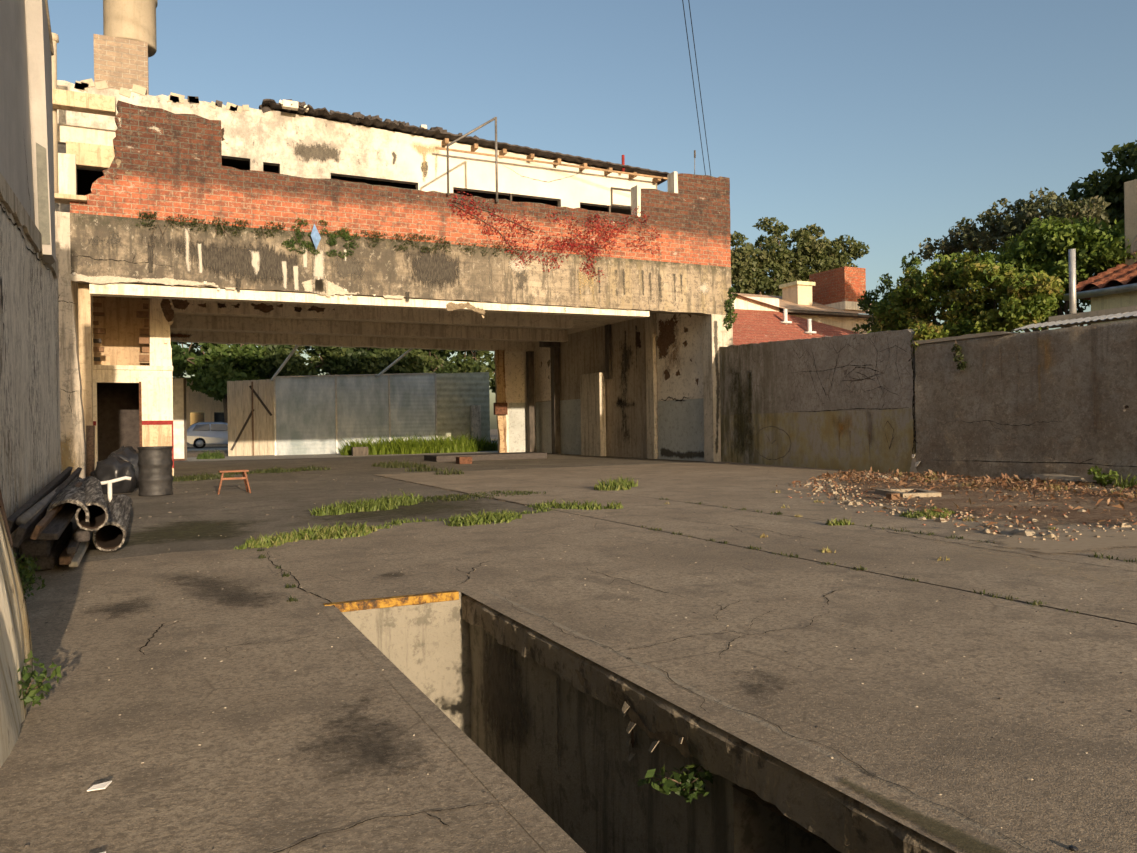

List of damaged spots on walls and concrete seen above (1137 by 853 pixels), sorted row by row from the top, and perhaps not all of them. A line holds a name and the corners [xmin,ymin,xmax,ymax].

crack [0,143,49,270]
leakage [405,247,460,302]
peeling [656,314,692,380]
leakage [661,321,752,459]
crack [177,551,335,653]
leakage [481,634,528,751]
crack [457,560,1037,853]
crack [273,800,506,853]